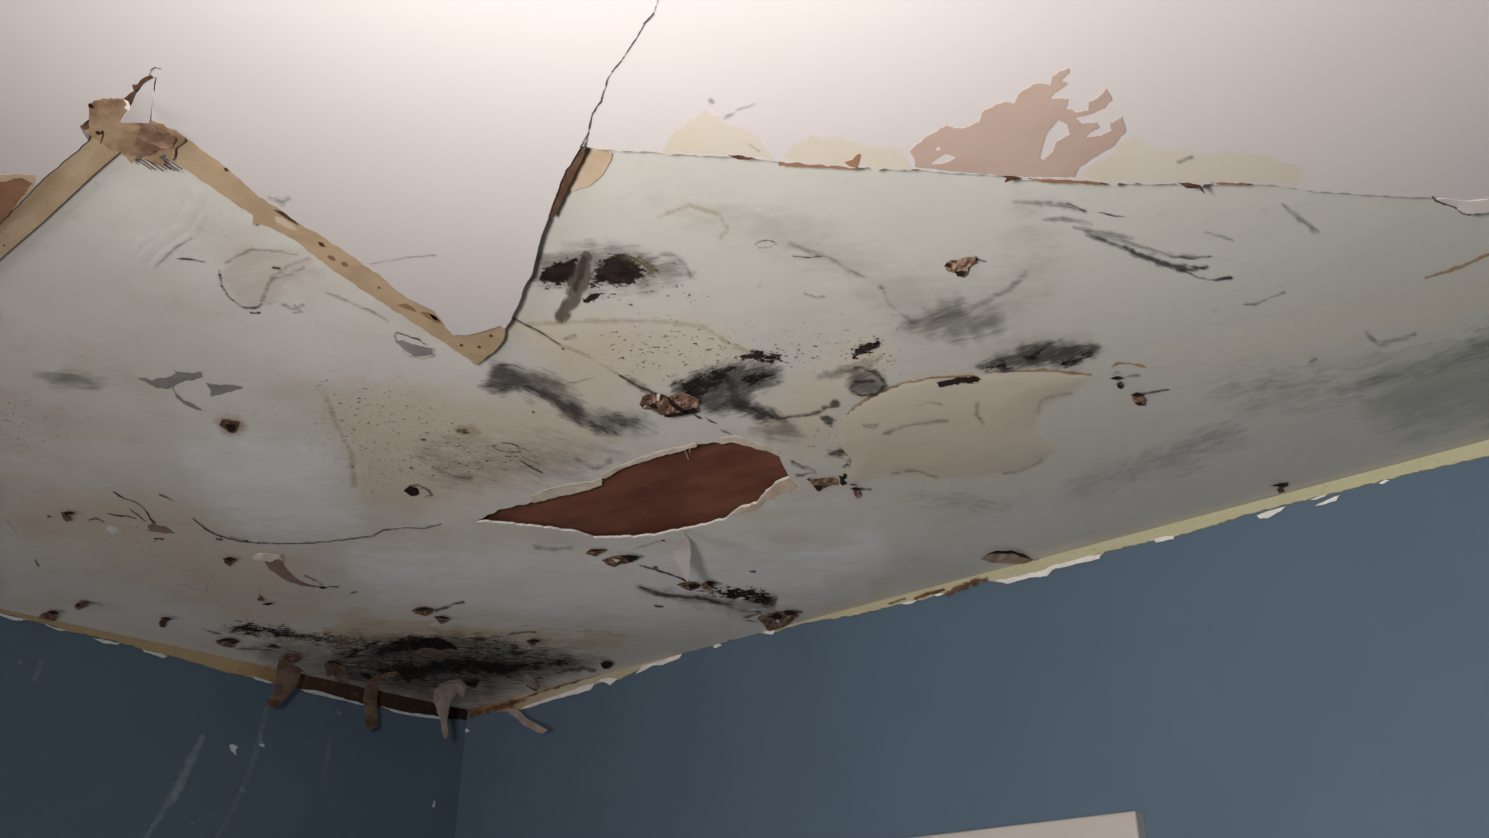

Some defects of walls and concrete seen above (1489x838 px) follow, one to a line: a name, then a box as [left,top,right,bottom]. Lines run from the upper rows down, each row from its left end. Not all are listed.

crack [580,0,658,153]
peeling [661,68,1302,188]
peeling [0,173,35,222]
leakage [305,173,1489,522]
crack [89,492,152,535]
peeling [147,519,175,540]
crack [193,519,439,544]
leakage [0,397,645,695]
peeling [158,414,905,649]
peeling [414,648,452,659]
peeling [636,654,682,674]